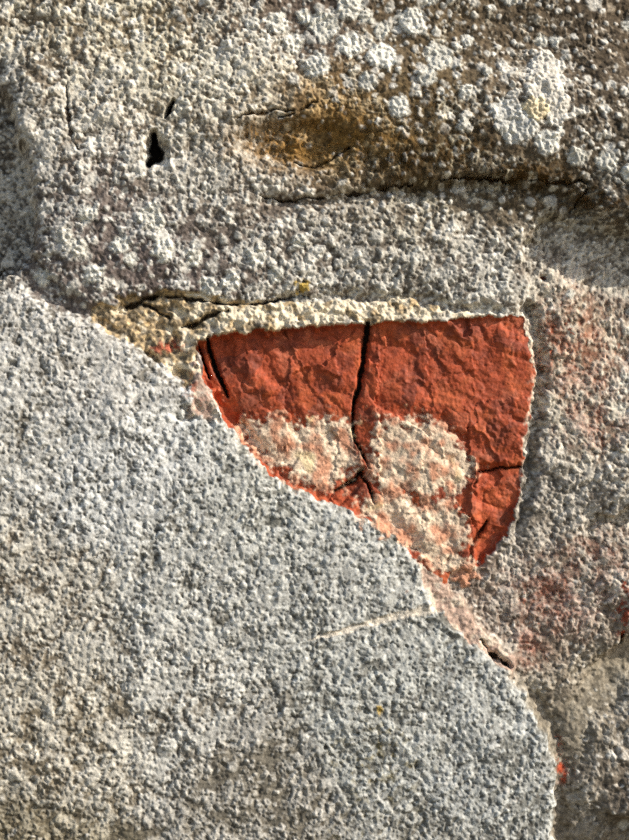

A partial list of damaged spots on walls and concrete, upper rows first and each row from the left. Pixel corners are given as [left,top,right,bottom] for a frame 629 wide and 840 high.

crack [237,101,316,119]
crack [299,147,350,169]
crack [333,321,374,499]
crack [473,466,521,487]
spalling [234,409,481,588]
crack [469,521,487,561]